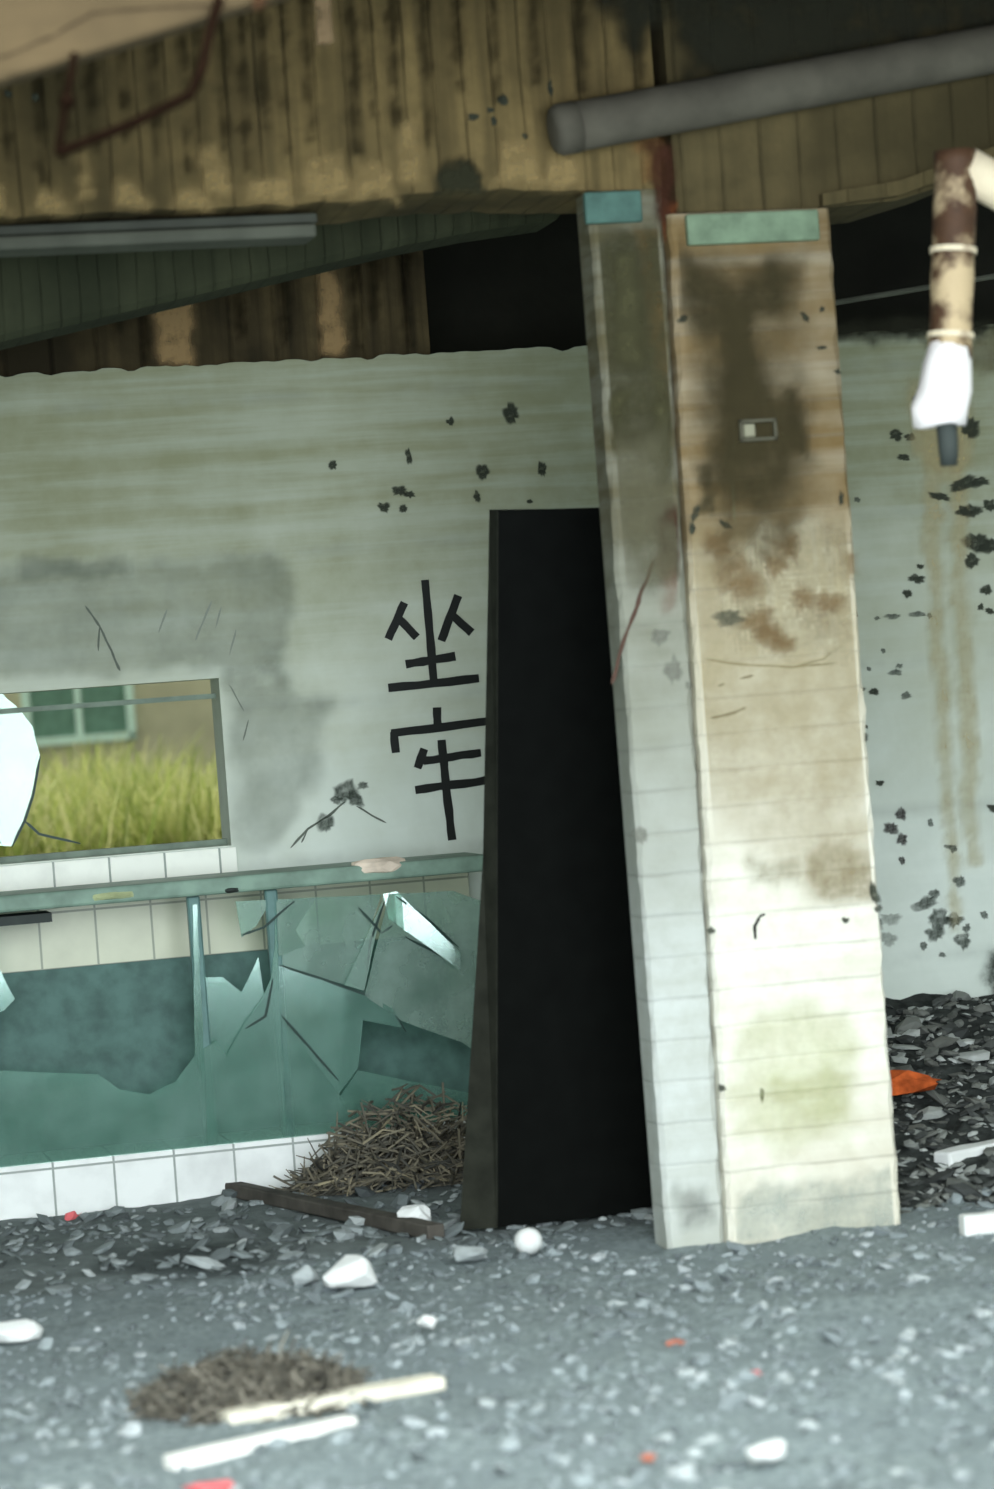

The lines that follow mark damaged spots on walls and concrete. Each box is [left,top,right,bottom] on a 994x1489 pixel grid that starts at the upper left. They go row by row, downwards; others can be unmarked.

leakage [684,261,805,511]
spalling [962,418,979,438]
spalling [378,486,415,512]
spalling [930,475,994,568]
crack [85,606,120,671]
leakage [716,609,751,625]
spalling [875,564,932,620]
spalling [978,585,994,614]
crack [290,802,386,848]
spalling [884,808,907,864]
spalling [870,883,882,912]
spalling [915,890,988,957]